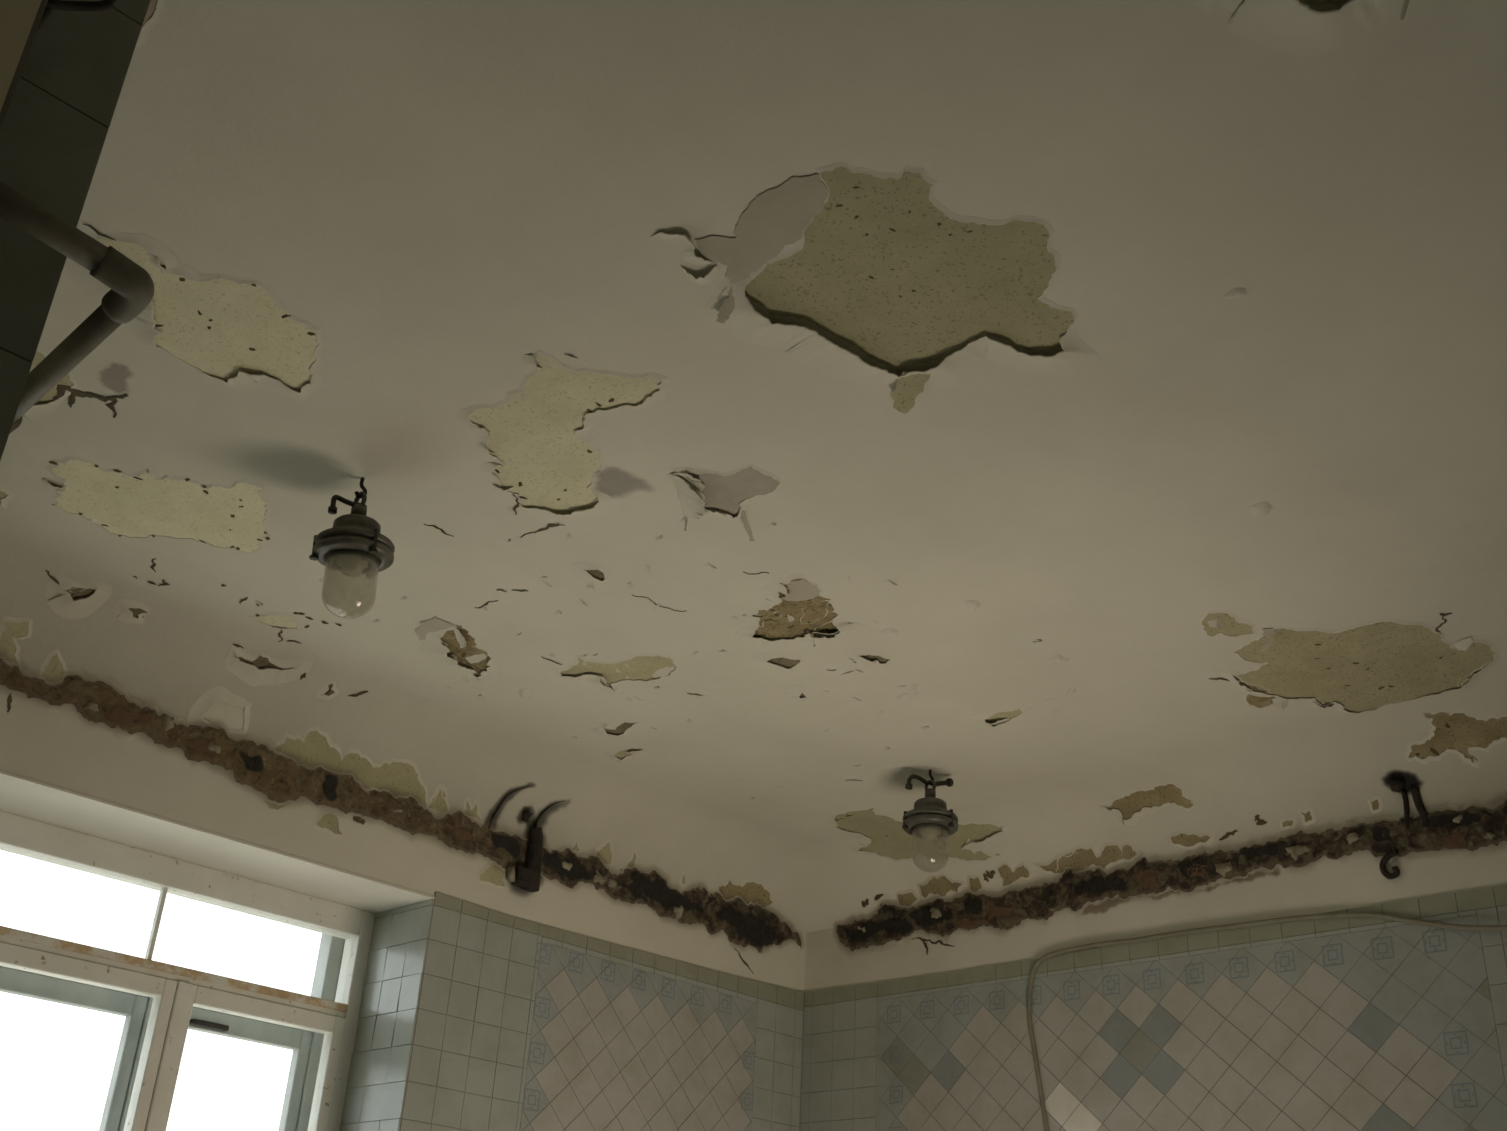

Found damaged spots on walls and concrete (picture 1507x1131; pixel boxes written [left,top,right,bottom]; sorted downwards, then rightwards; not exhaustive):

peeling [1188,0,1422,56]
peeling [83,223,327,402]
peeling [650,162,1098,414]
peeling [457,350,672,542]
peeling [668,464,784,541]
peeling [45,570,152,624]
peeling [187,598,342,736]
peeling [415,617,504,698]
peeling [542,650,717,703]
peeling [718,575,897,675]
peeling [1197,611,1507,769]
peeling [829,781,1196,908]